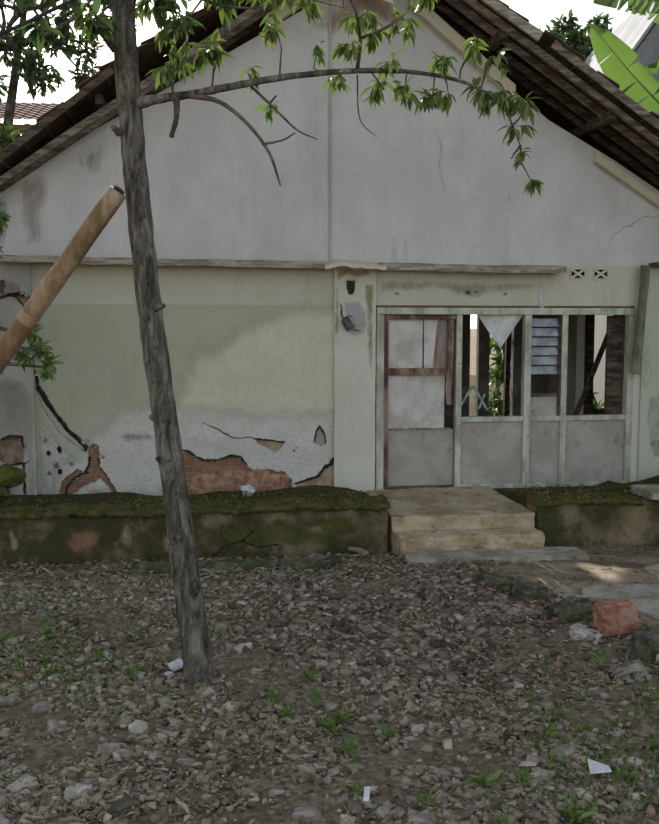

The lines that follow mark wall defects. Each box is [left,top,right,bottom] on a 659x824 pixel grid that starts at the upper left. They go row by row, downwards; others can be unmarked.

flaking render [39,421,77,494]
spalling [182,449,334,495]
peeling [254,438,285,452]
peeling [314,425,326,446]
crack [211,524,279,557]